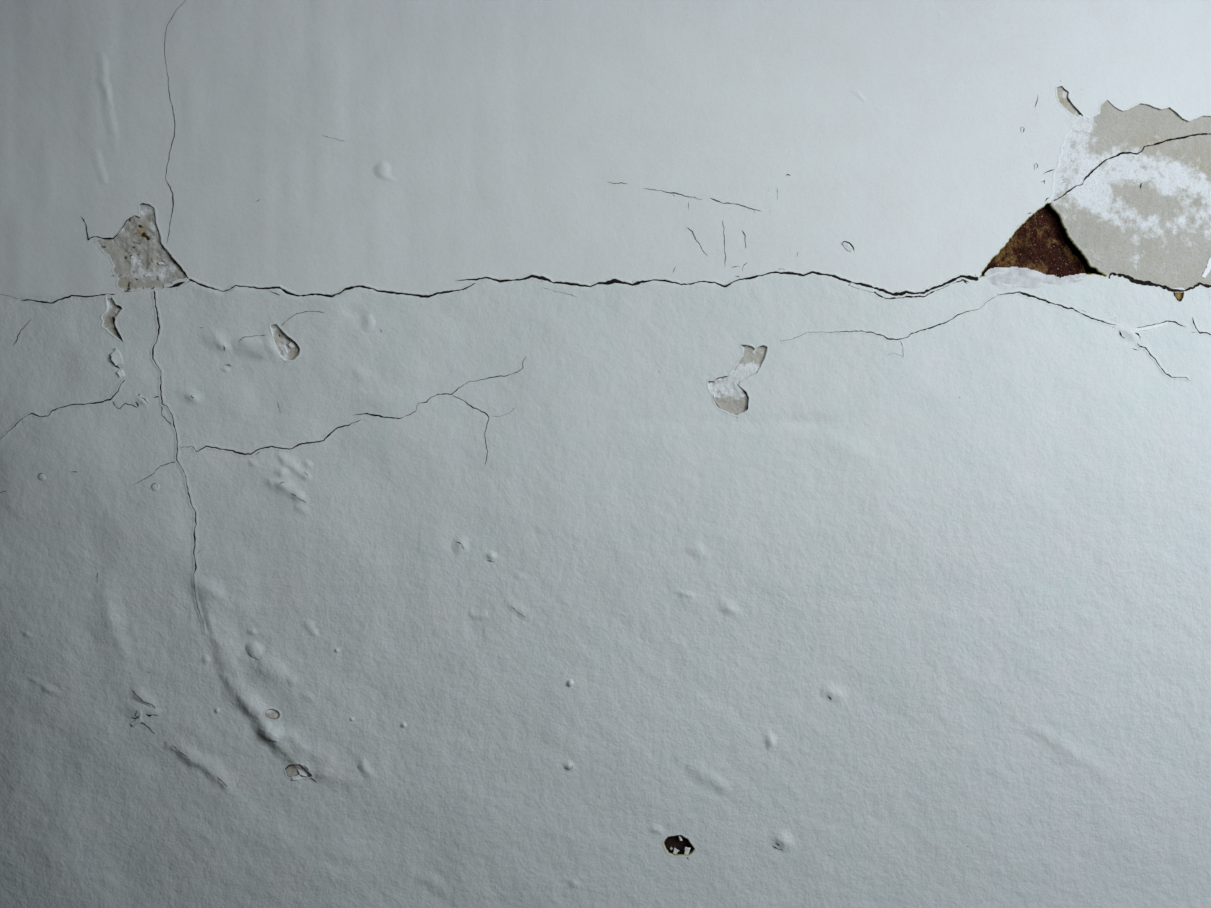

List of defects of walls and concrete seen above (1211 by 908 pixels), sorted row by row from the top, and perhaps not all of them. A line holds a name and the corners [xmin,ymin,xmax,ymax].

peeling [978,84,1211,303]
crack [1054,133,1211,201]
peeling [75,201,190,377]
spalling [239,311,320,363]
spalling [706,343,769,417]
crack [0,268,1211,635]
peeling [283,762,317,783]
spalling [662,833,697,861]